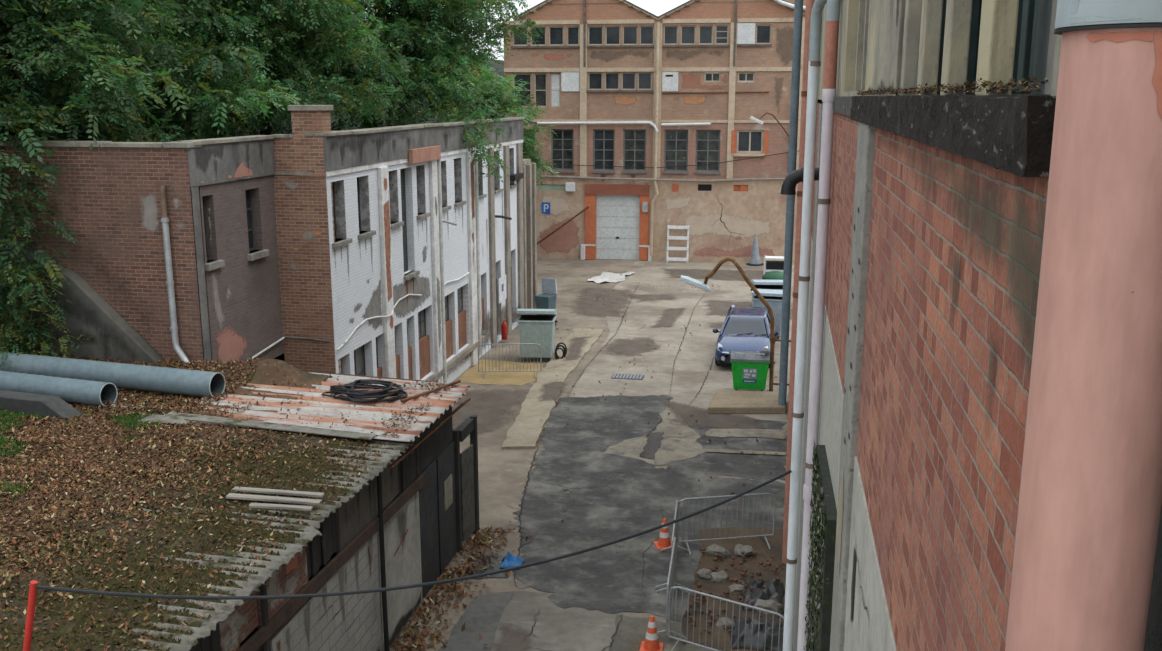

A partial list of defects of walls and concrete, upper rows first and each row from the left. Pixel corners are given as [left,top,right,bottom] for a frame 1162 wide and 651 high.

peeling [1069,0,1162,119]
peeling [350,178,441,347]
peeling [540,196,579,252]
corrosion [400,380,461,403]
crack [507,438,623,587]